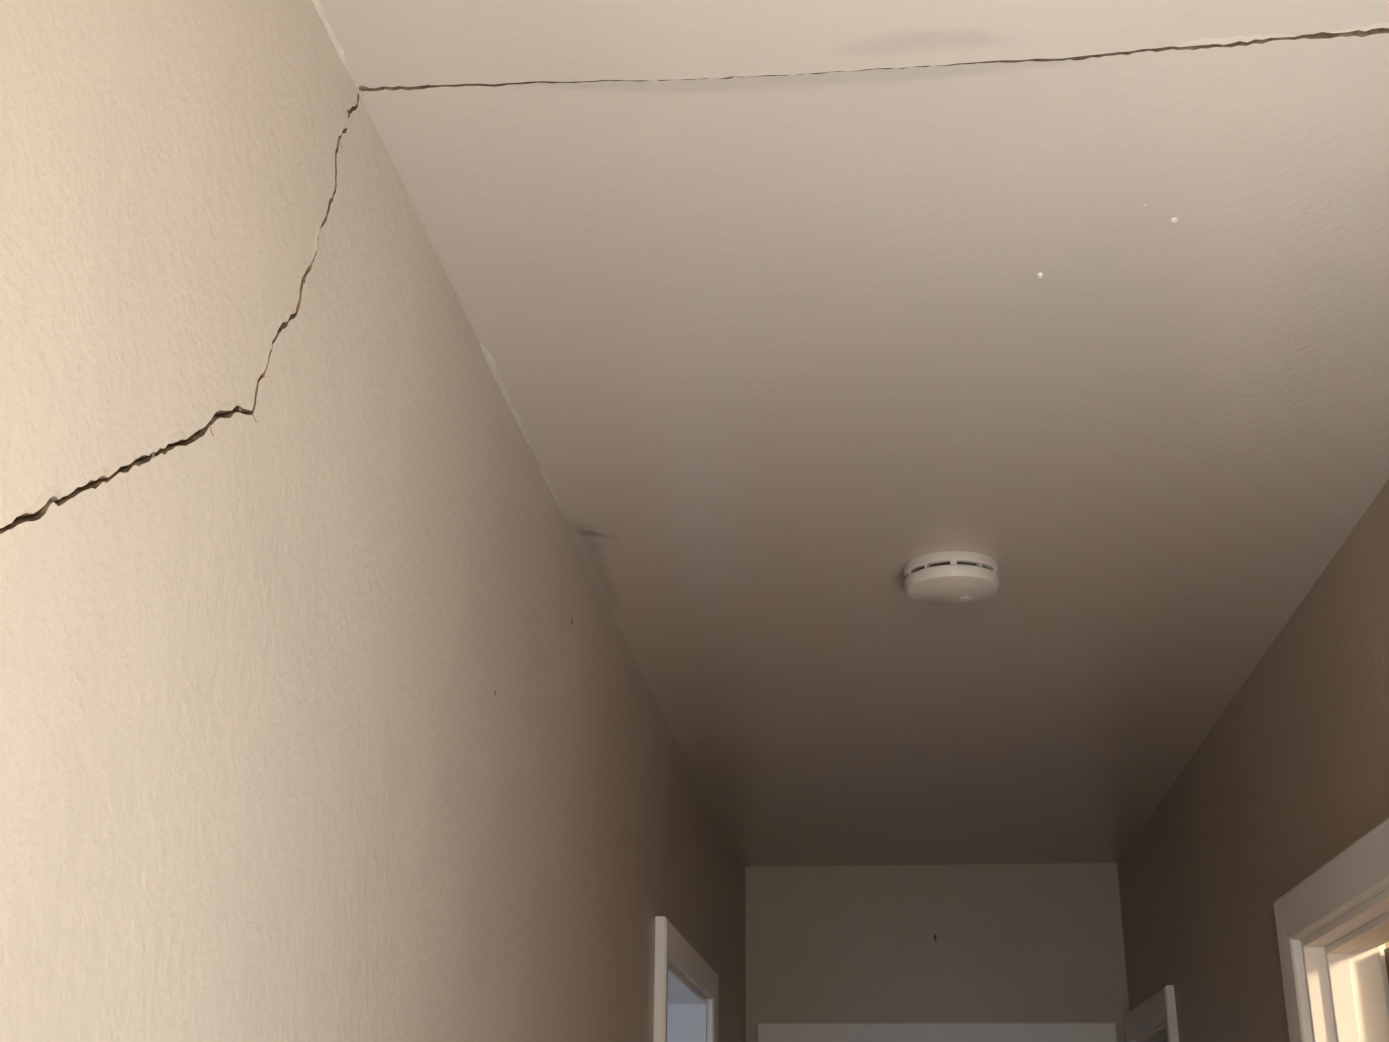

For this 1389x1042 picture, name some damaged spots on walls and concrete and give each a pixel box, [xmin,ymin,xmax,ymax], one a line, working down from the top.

crack [0,22,1389,534]